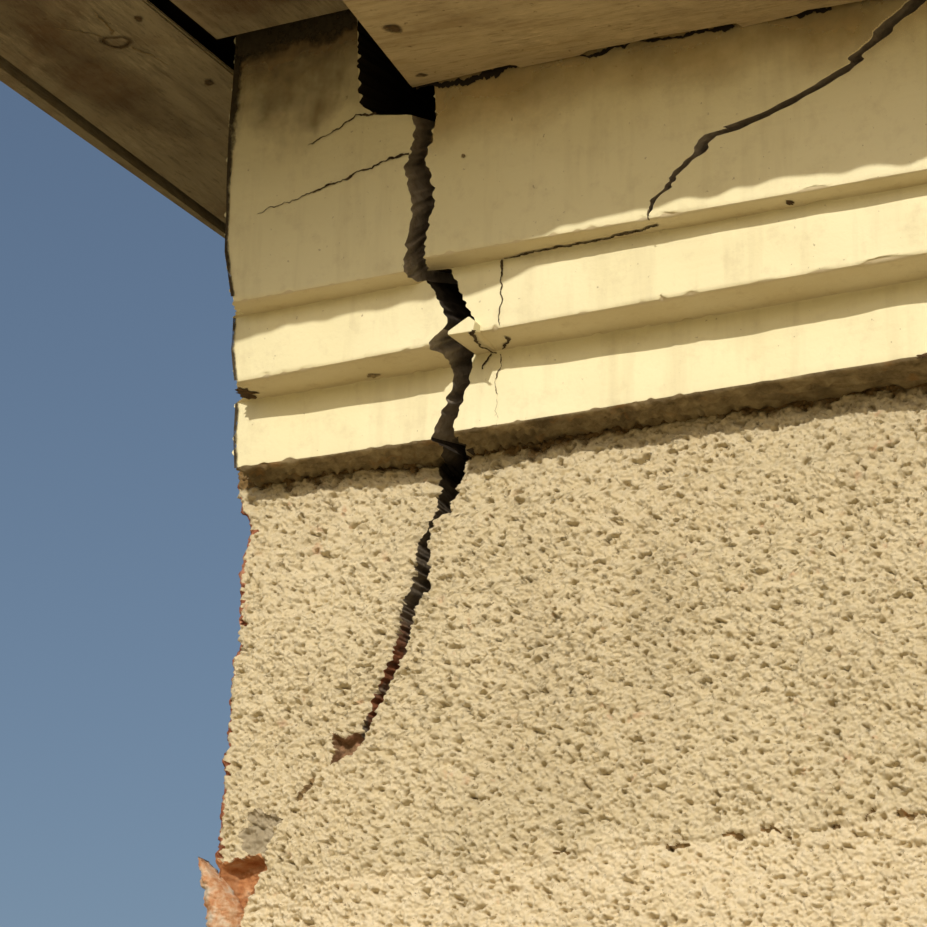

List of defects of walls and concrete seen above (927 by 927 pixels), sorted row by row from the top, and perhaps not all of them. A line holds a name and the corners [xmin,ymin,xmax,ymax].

crack [495,0,927,410]
spalling [237,485,259,631]
crack [258,21,475,801]
spalling [198,644,283,927]